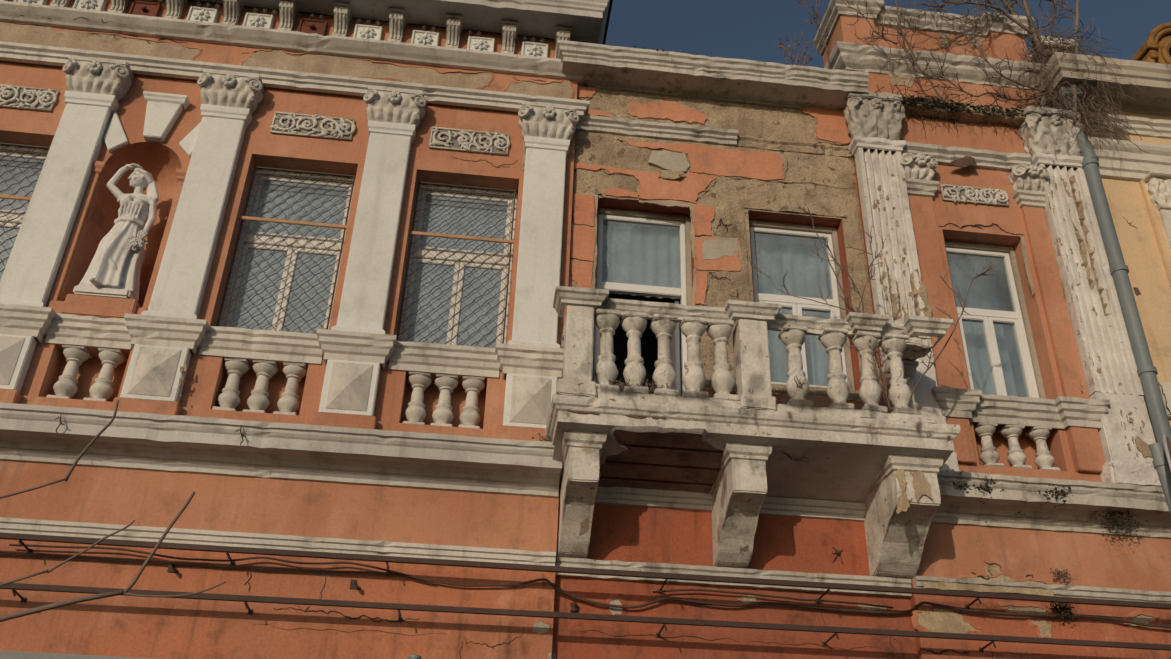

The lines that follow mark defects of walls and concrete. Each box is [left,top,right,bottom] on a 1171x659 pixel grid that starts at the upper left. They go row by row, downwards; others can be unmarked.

flaking render [240,49,709,126]
flaking render [568,138,787,307]
peeling [873,185,932,320]
crack [938,223,1024,235]
peeling [1043,175,1111,332]
spalling [598,415,724,495]
peeling [1120,409,1152,457]
crack [255,573,524,659]
crack [584,611,868,659]
flaking render [911,607,985,640]
crack [920,648,1048,658]
peeling [923,564,1056,638]